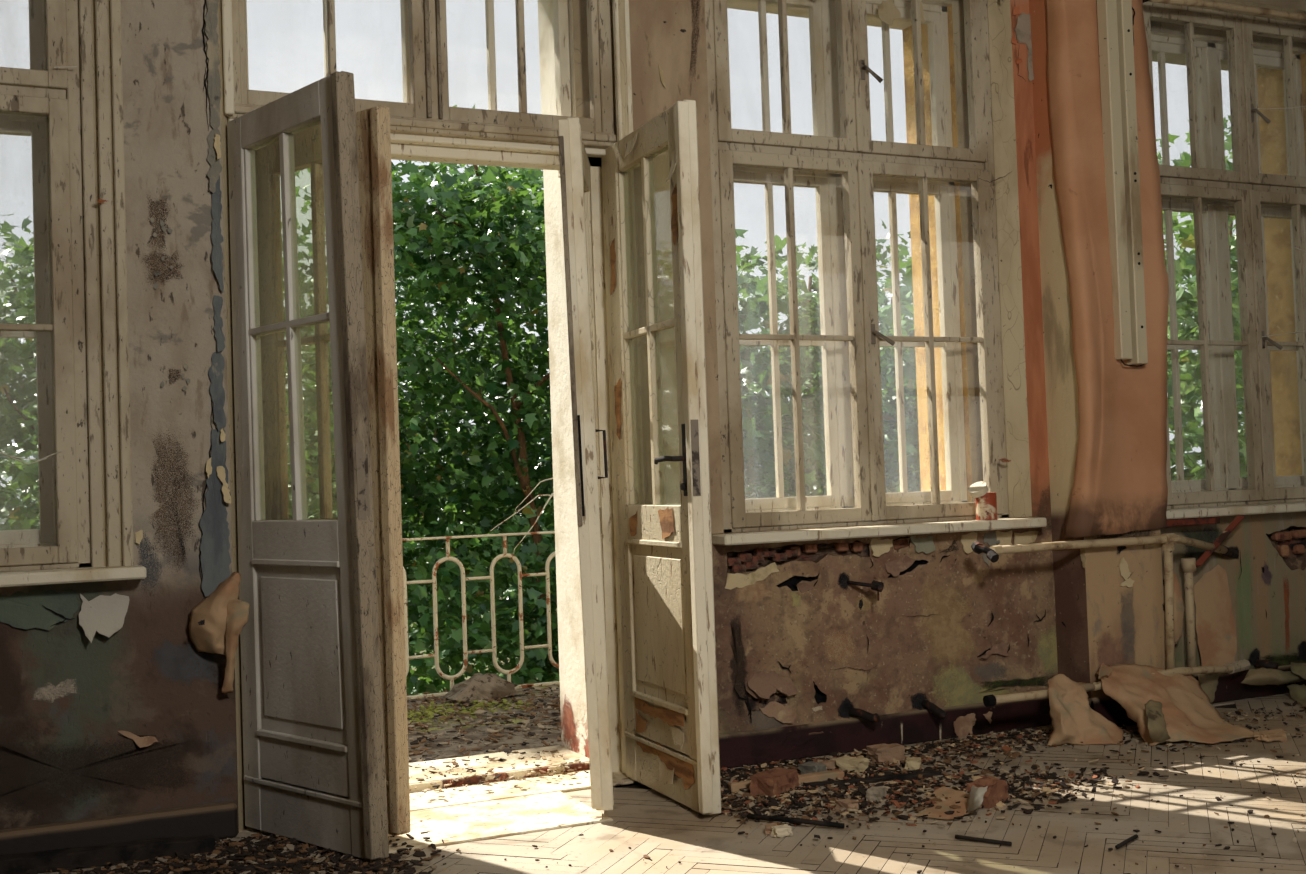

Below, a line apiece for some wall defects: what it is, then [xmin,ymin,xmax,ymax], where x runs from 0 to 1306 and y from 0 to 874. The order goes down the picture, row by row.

damp [142,195,184,289]
peeling [199,128,232,597]
damp [135,425,200,591]
flaking render [725,536,936,590]
spalling [1266,526,1306,571]
flaking render [744,671,798,724]
flaking render [812,681,827,712]